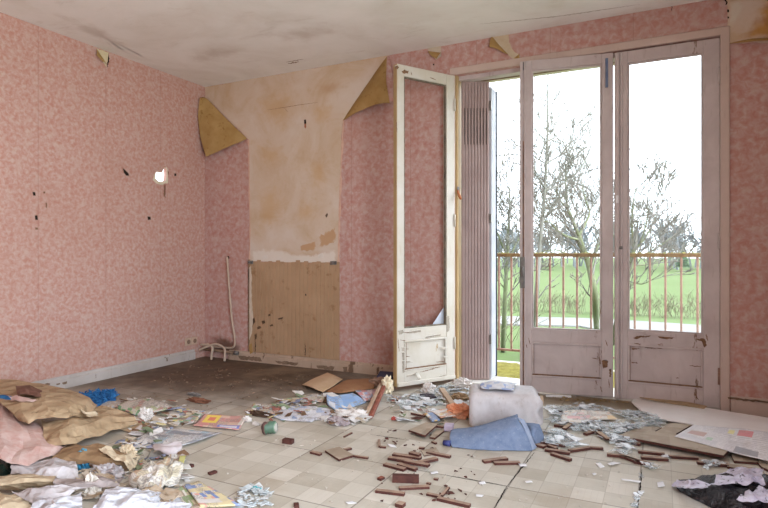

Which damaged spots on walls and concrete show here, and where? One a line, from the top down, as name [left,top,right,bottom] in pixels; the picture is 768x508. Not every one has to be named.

flaking render [205,55,389,362]
crack [447,452,535,508]